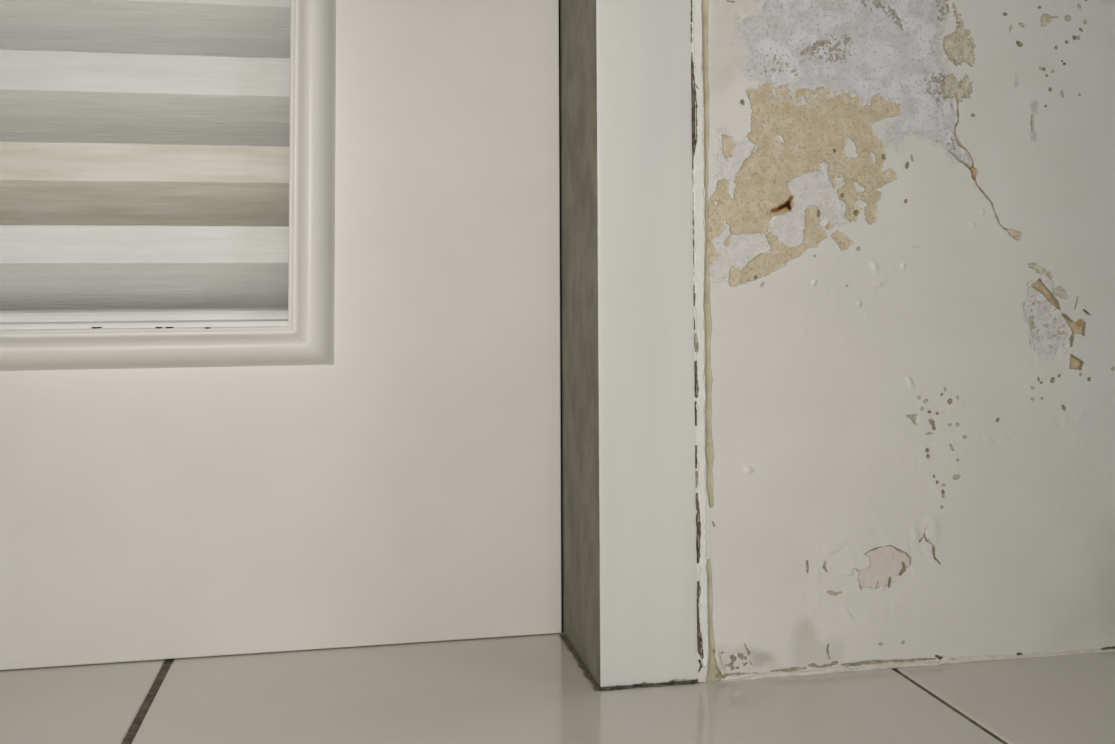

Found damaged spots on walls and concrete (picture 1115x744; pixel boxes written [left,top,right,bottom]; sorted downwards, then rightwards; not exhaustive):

water stain [739,0,964,160]
crack [948,100,1022,240]
peeling [702,0,913,507]
spalling [1024,263,1091,400]
peeling [706,559,726,682]
peeling [856,545,911,590]